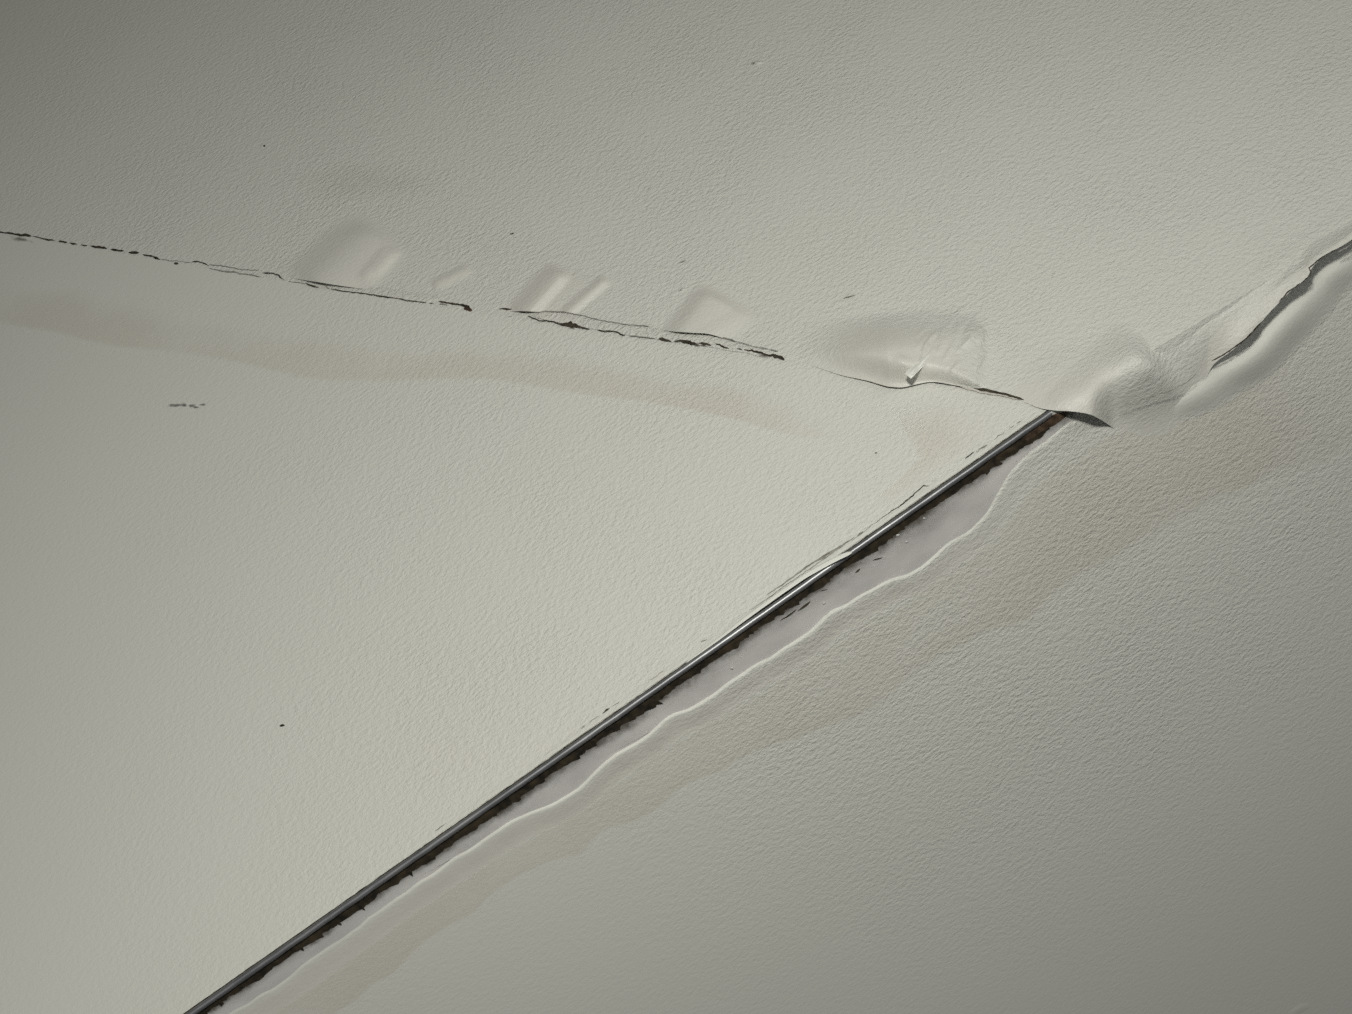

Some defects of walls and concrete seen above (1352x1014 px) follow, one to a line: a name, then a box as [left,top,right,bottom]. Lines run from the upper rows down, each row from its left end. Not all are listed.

crack [0,231,785,360]
crack [1121,240,1352,407]
crack [931,382,1024,400]